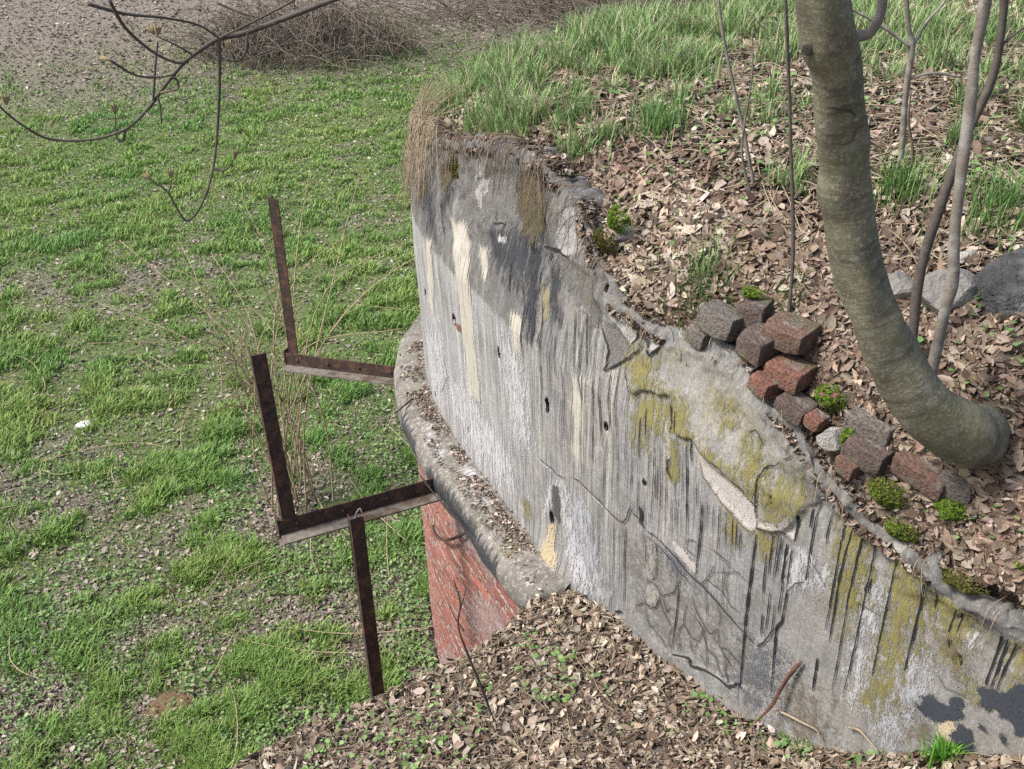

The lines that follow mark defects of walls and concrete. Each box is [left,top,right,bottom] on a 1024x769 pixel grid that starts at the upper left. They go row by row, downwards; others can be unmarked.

crack [517,453,778,691]
leakage [415,160,1024,750]
spalling [693,443,826,542]